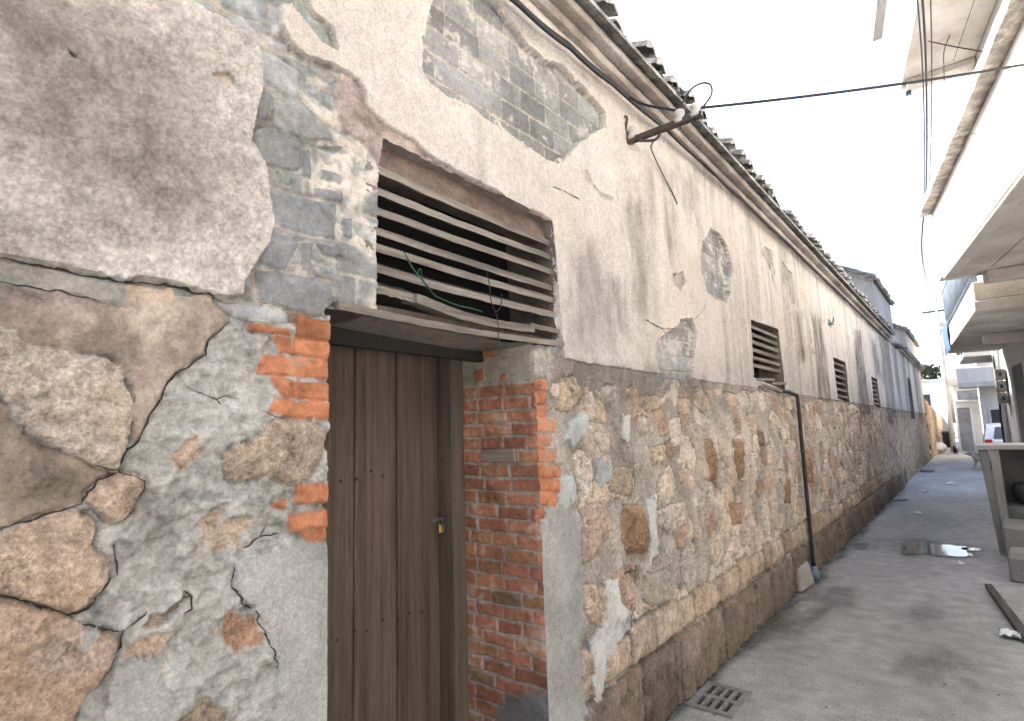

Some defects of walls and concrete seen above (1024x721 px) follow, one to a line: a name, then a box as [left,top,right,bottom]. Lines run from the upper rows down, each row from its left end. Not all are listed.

spalling [418,0,607,167]
peeling [112,0,496,324]
peeling [10,254,98,276]
crack [0,257,239,530]
peeling [531,235,565,354]
spalling [655,315,698,380]
spalling [700,225,733,304]
crack [231,525,279,668]